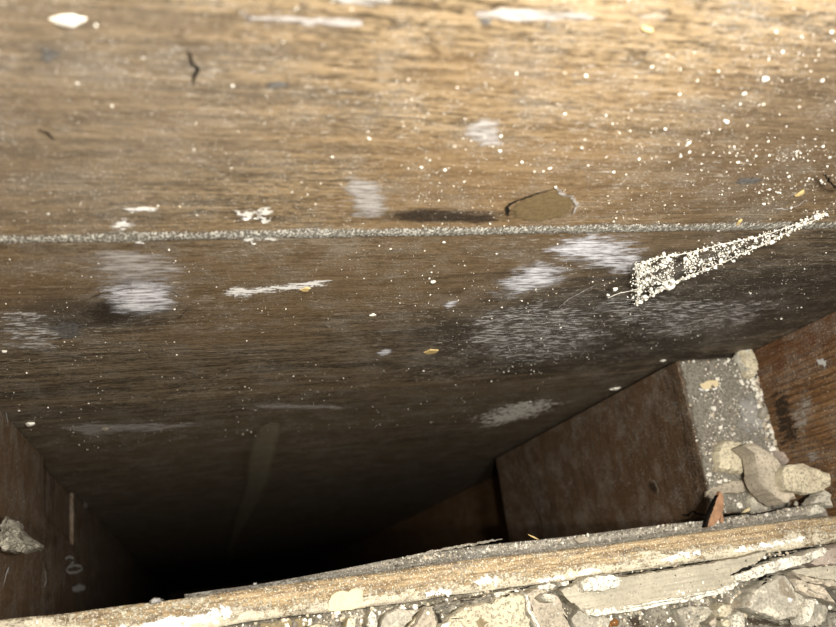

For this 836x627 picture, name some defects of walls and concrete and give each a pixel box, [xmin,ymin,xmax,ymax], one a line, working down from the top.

damp [546,236,640,274]
damp [0,241,178,349]
damp [223,280,332,298]
damp [501,263,565,294]
damp [469,396,573,428]